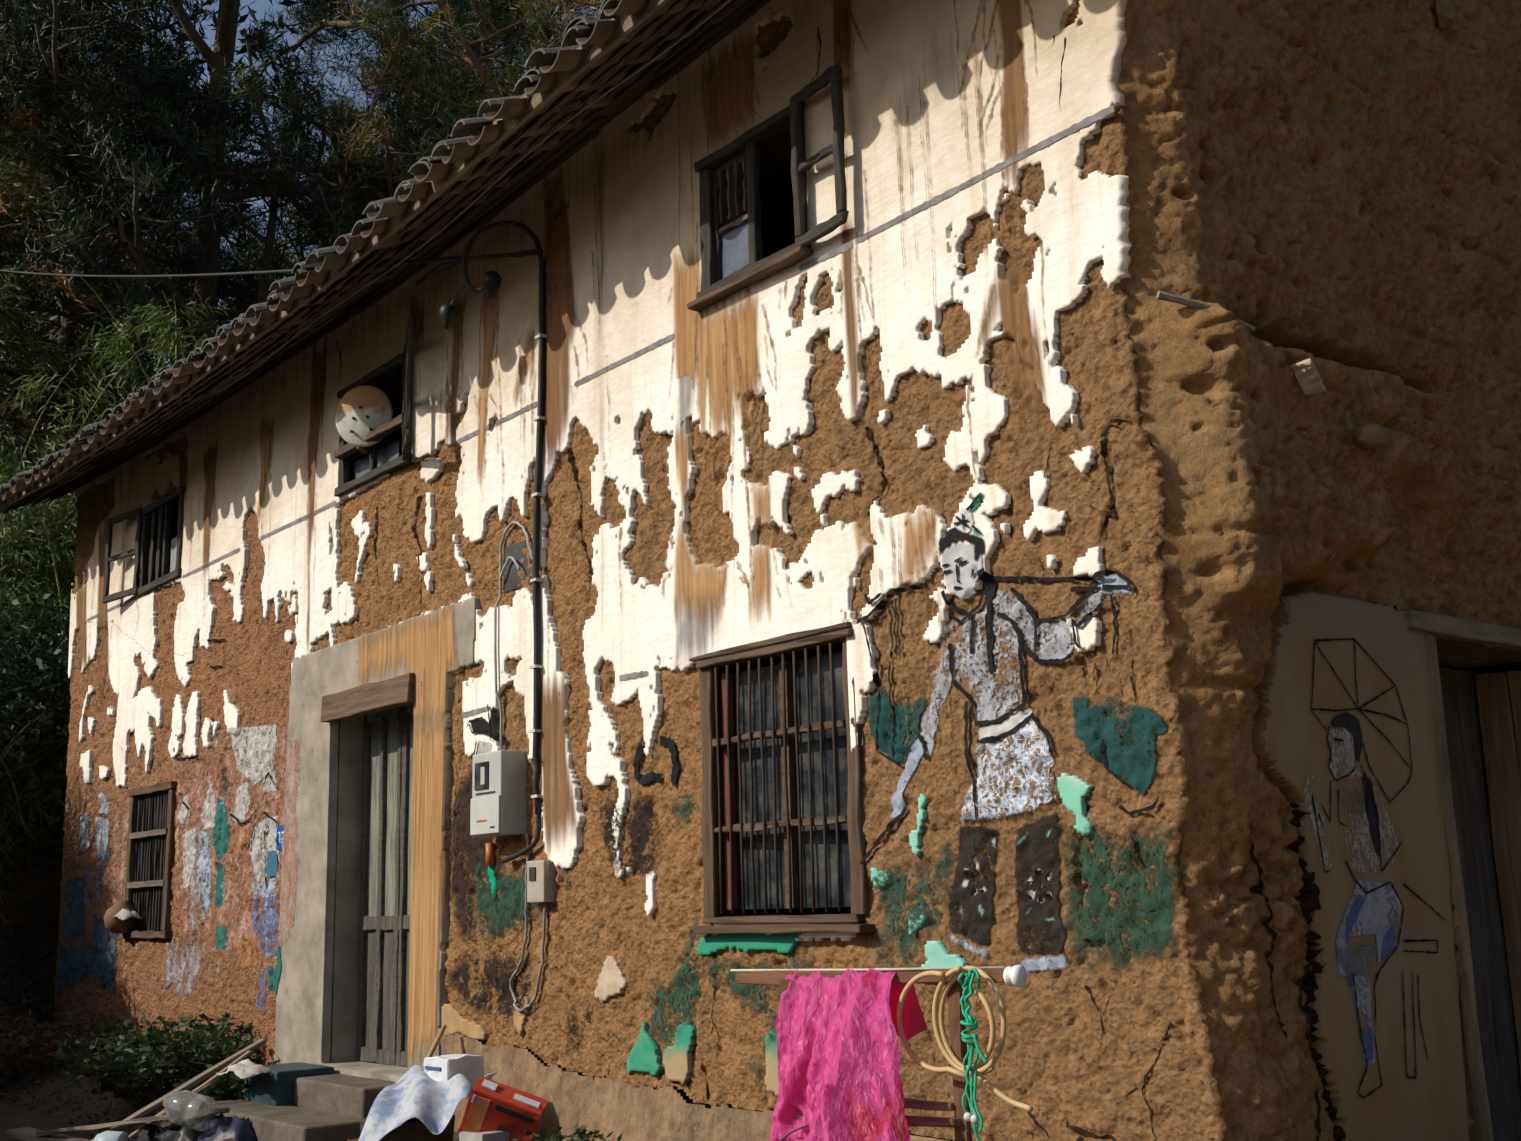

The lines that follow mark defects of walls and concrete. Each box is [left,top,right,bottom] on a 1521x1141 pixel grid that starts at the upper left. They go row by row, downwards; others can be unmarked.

flaking render [950,164,1057,284]
crack [567,449,593,590]
flaking render [55,259,1228,1141]
crack [1085,985,1113,1040]
crack [1027,1111,1117,1141]
crack [1126,1022,1173,1141]